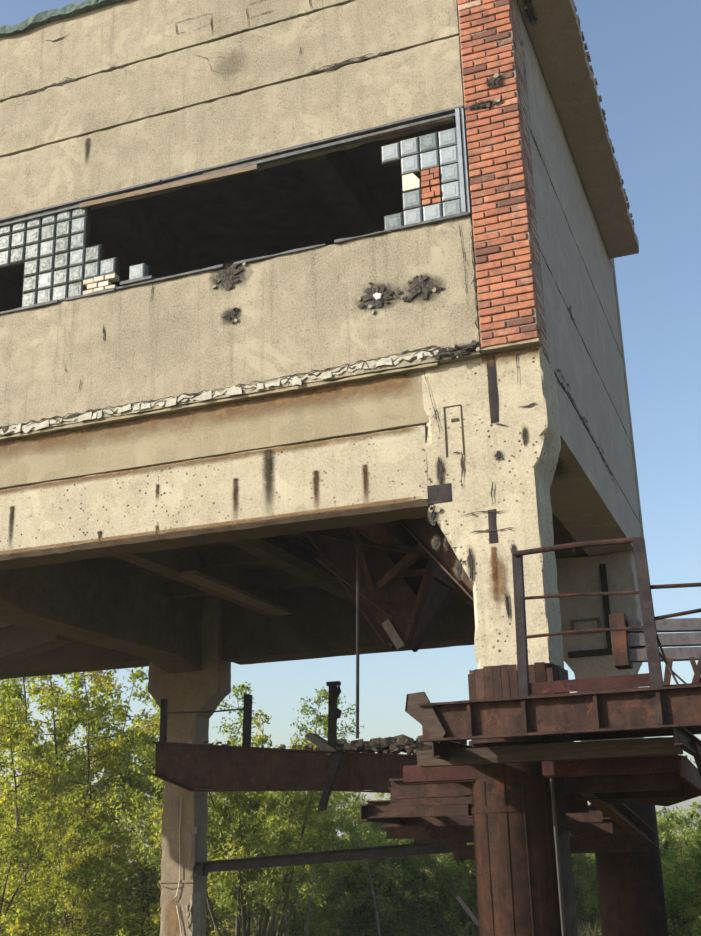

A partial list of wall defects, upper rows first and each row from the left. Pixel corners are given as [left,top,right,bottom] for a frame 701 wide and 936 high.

spalling [211,262,246,291]
spalling [358,274,443,314]
spalling [222,307,240,324]
peeling [0,340,481,434]